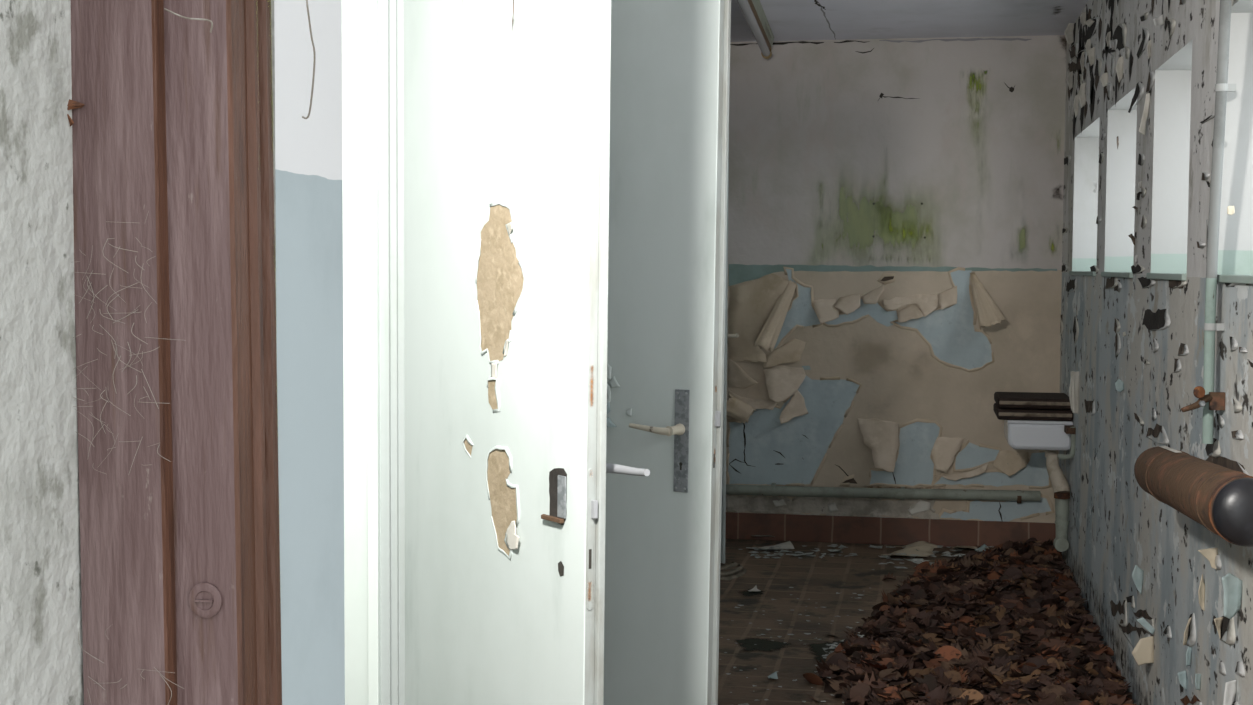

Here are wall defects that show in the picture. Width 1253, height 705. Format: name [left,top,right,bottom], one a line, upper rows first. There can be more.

crack [730,0,1031,46]
peeling [1064,0,1186,141]
peeling [1128,181,1187,289]
peeling [477,204,524,410]
peeling [1142,309,1171,365]
peeling [607,364,620,427]
peeling [726,267,1055,522]
peeling [1069,371,1096,415]
peeling [1134,408,1169,444]
peeling [1205,397,1250,476]
peeling [487,449,519,556]
peeling [1110,548,1245,705]